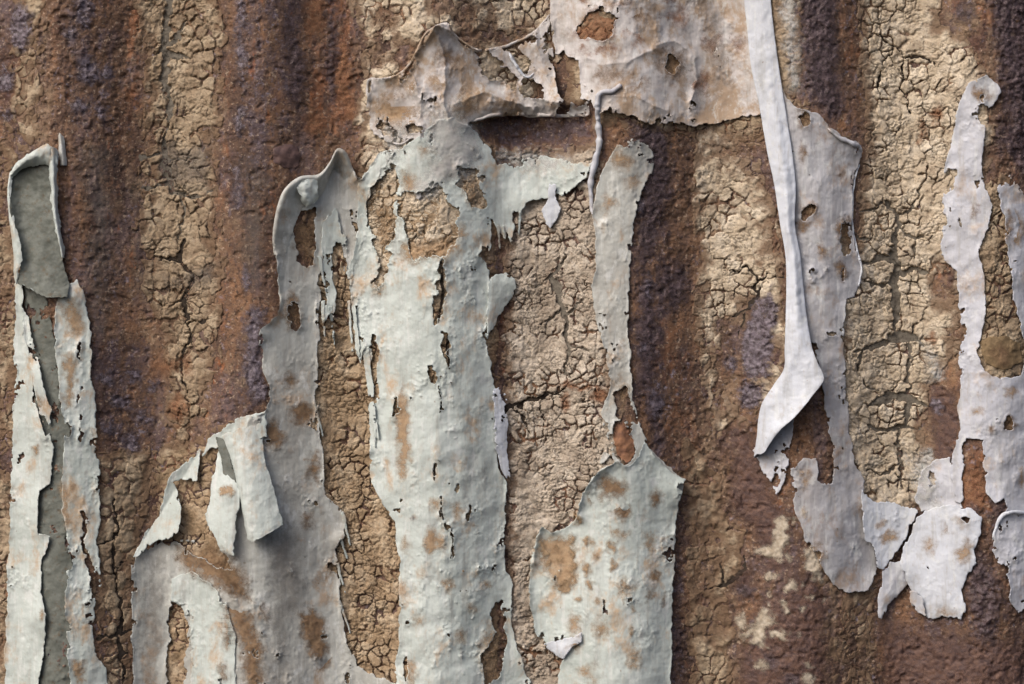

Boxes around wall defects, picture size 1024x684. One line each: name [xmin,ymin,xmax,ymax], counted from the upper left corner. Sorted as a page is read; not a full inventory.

crack [876,34,935,114]
crack [139,0,213,402]
peeling [0,0,786,684]
crack [504,255,590,442]
corrosion [612,122,688,451]
peeling [744,0,1024,684]
crack [854,180,928,489]
corrosion [930,386,959,459]
corrosion [961,466,986,506]
corrosion [176,545,265,684]
corrosion [734,575,830,684]
corrosion [881,546,1024,684]